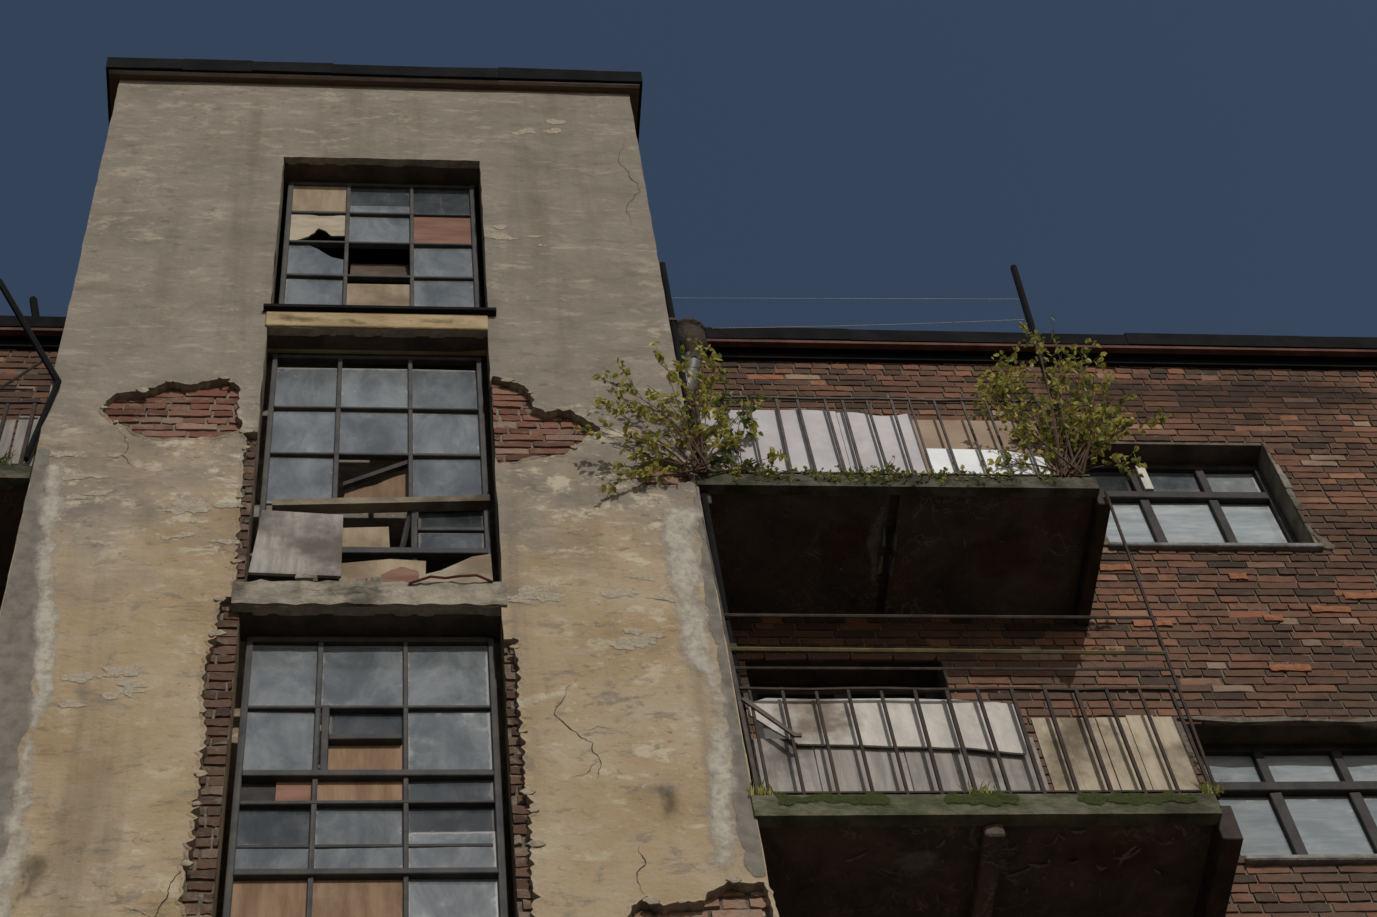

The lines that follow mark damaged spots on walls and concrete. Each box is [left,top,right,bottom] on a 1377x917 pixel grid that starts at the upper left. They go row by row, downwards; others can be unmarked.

spalling [98,376,255,452]
spalling [491,375,604,465]
crack [554,678,614,779]
water stain [663,497,766,877]
spalling [623,876,779,917]